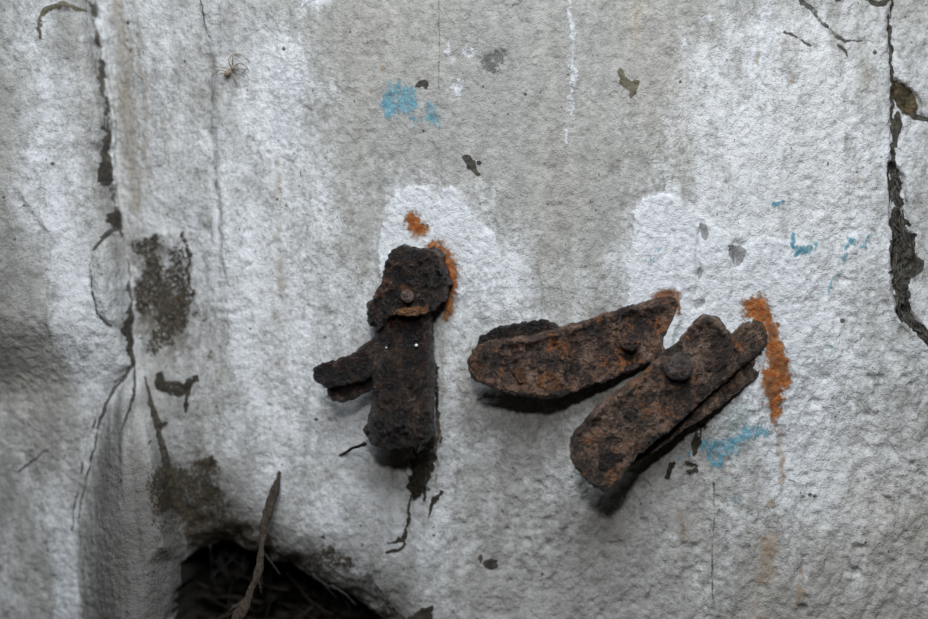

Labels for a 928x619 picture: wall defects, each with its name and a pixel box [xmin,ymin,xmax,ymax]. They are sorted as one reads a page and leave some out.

crack [783,30,812,46]
crack [799,0,862,57]
crack [866,0,928,346]
crack [71,0,176,530]
mould [129,230,207,361]
rust [396,305,429,317]
rust [404,210,461,322]
rust [653,289,681,315]
rust [741,294,793,423]
rust [598,452,626,472]
leakage [146,454,403,619]